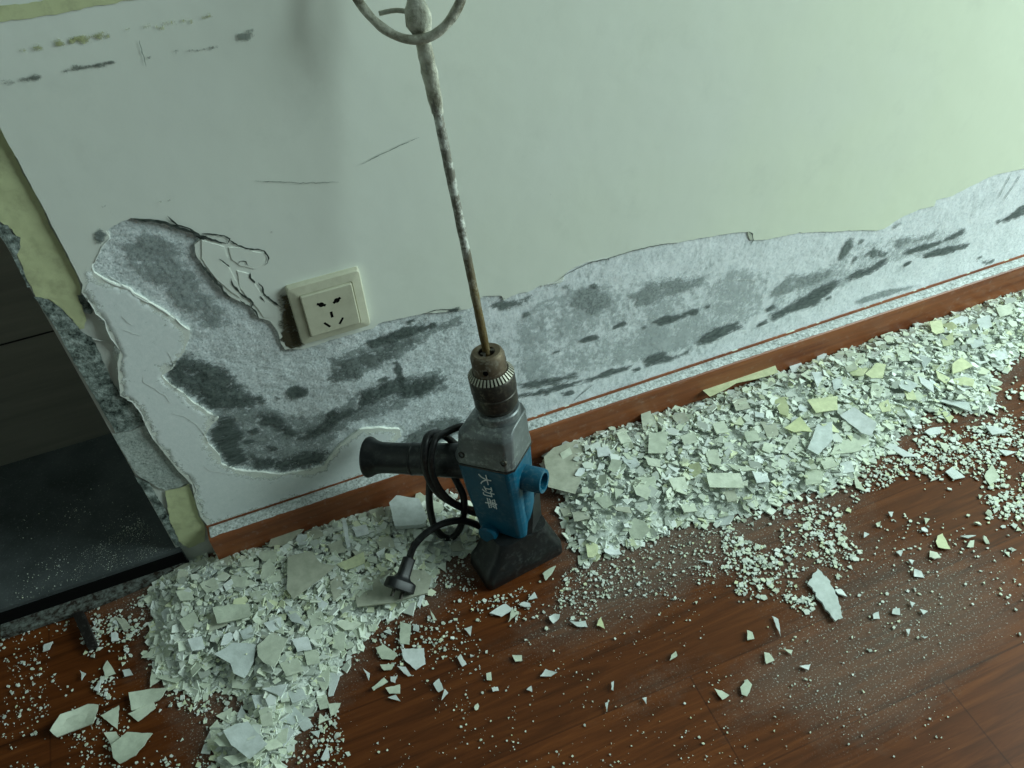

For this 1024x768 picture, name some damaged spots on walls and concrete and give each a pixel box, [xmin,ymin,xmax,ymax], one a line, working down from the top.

crack [130,217,282,318]
water stain [279,295,304,351]
water stain [167,307,465,472]
flaking render [0,169,1024,524]
water stain [491,223,969,398]
spalling [135,477,182,548]